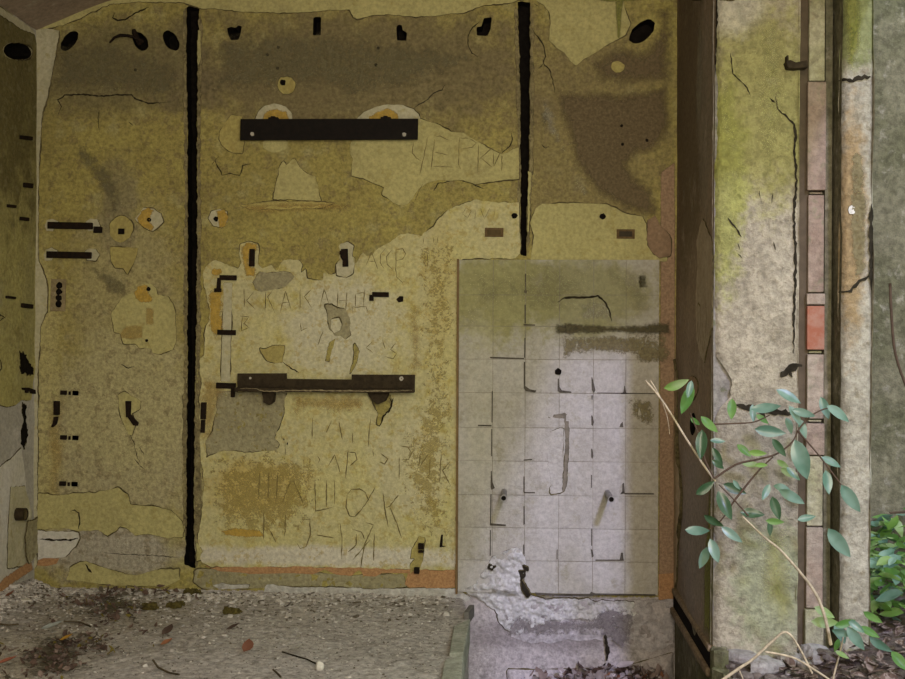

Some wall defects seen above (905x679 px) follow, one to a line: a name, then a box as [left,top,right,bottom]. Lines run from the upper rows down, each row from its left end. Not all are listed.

peeling [0,0,672,593]
water stain [562,90,667,213]
water stain [598,12,667,80]
crack [715,0,798,354]
spalling [464,359,710,679]